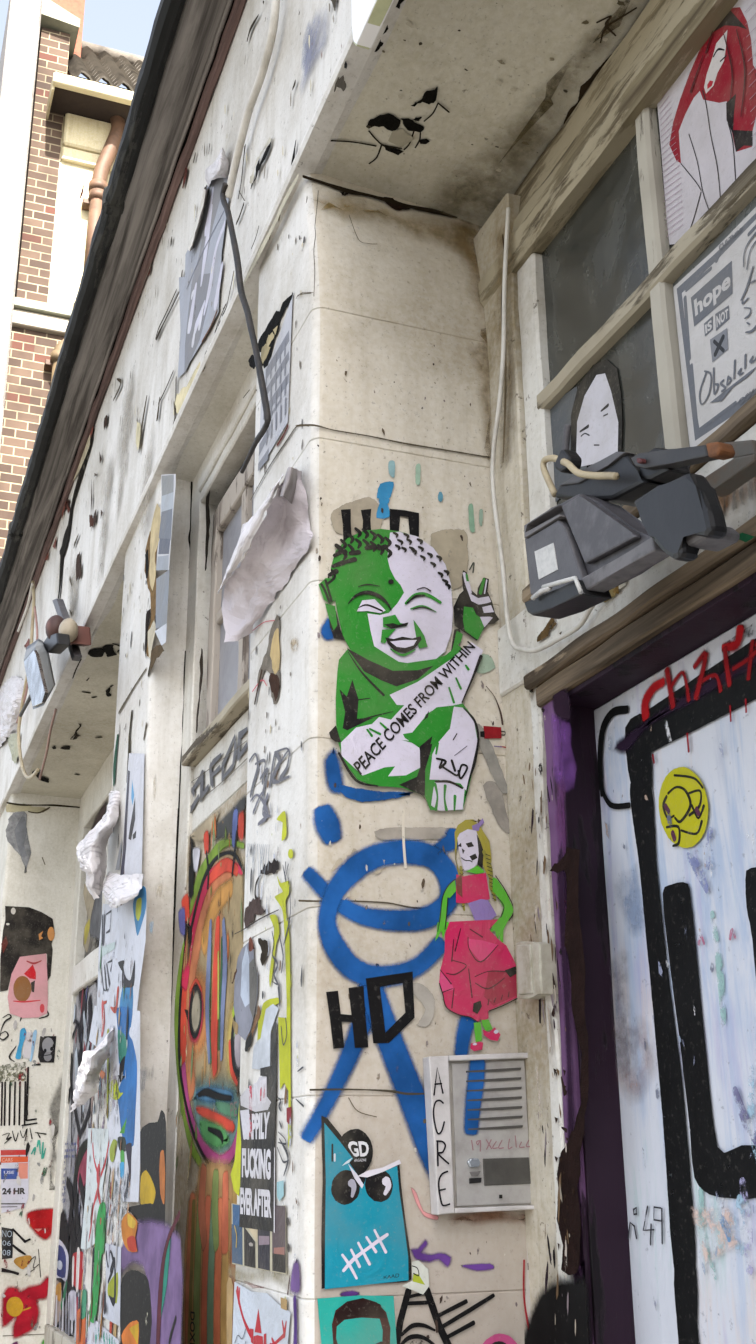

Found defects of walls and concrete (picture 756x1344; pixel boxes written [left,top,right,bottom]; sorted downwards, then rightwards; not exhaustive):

peeling [375,0,422,54]
peeling [331,86,450,164]